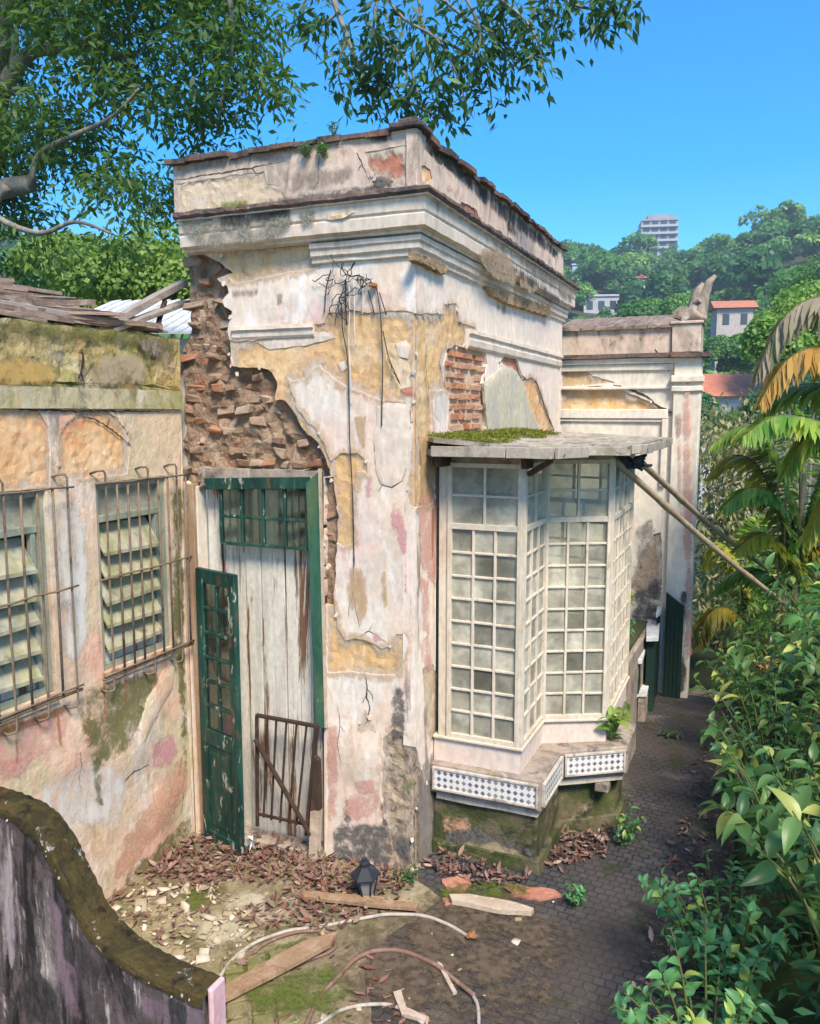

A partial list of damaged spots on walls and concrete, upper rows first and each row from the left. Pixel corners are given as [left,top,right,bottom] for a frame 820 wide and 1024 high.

flaking render [365,145,406,181]
leakage [221,198,314,226]
leakage [136,338,167,364]
flaking render [180,245,488,742]
flaking render [499,357,693,658]
leakage [636,521,653,561]
crack [337,676,373,762]
leakage [391,679,409,737]
leakage [333,708,434,871]
leakage [445,827,534,857]